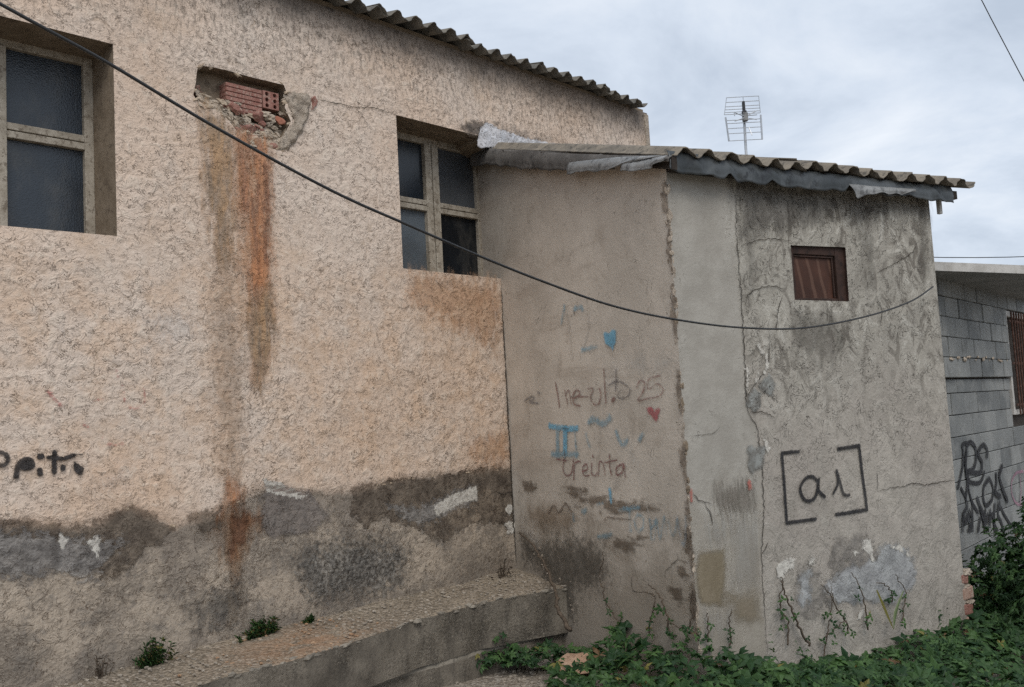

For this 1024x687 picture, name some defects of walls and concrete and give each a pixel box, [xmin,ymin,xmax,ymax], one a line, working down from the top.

spalling [193,63,318,155]
corrosion [199,107,275,392]
leakage [195,582,246,631]
corrosion [217,477,262,574]
leakage [294,535,413,607]
leakage [504,504,604,619]
leakage [566,486,656,515]
leakage [614,535,647,552]
flaking render [776,534,917,620]
crack [876,470,954,491]